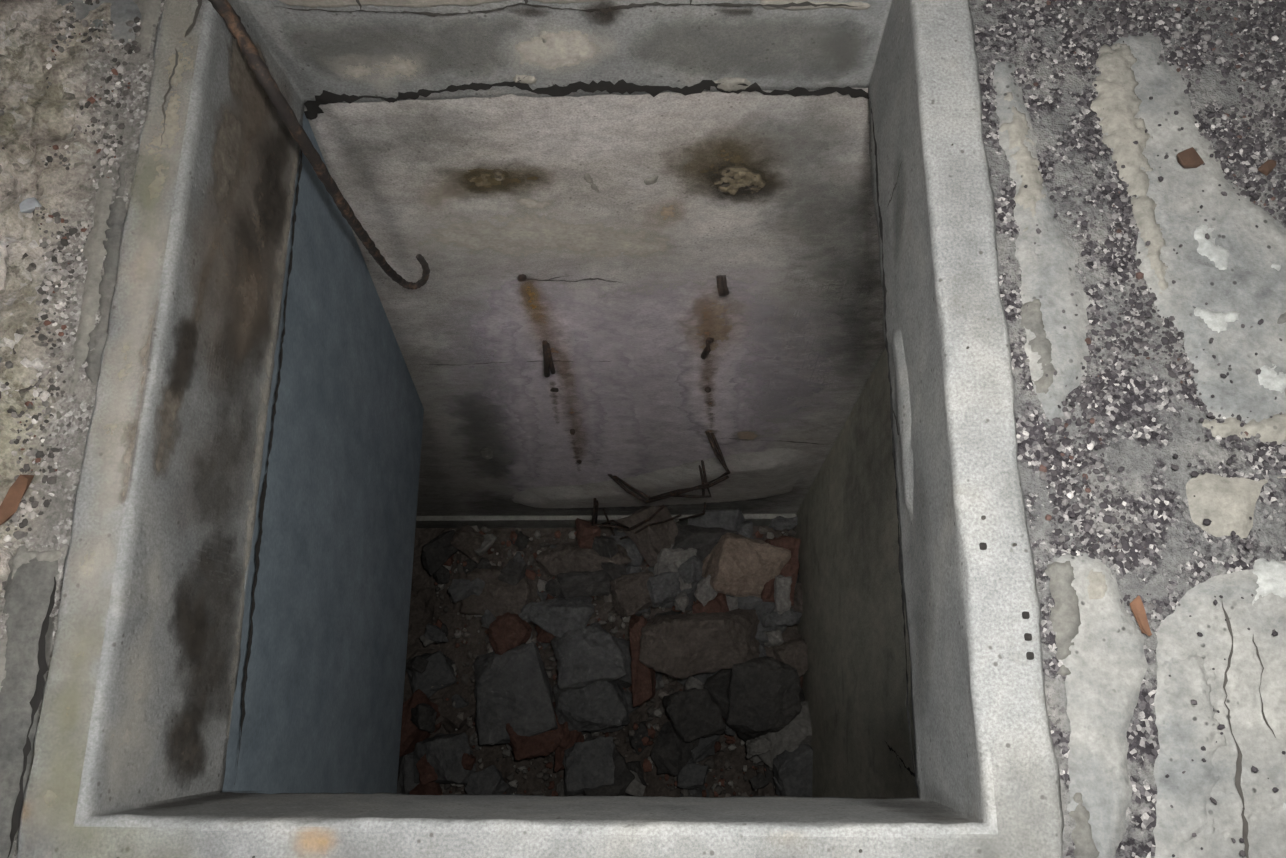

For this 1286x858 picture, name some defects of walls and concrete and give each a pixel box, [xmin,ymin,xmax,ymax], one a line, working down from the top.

crack [274,0,869,17]
crack [234,149,302,785]
crack [304,77,916,780]
leakage [481,284,764,490]
crack [8,577,56,858]
leakage [168,545,237,778]
crack [1222,603,1276,858]